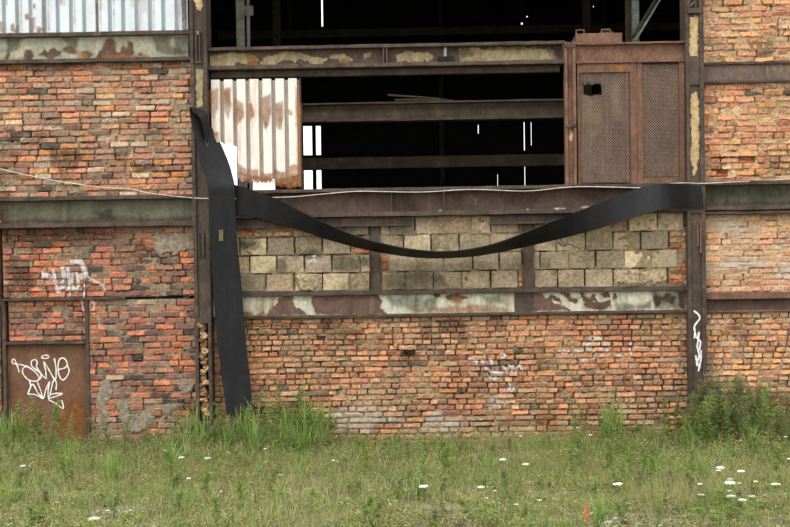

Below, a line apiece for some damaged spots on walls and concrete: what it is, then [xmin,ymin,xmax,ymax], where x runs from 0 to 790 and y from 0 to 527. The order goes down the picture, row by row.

peeling [24,38,141,59]
peeling [396,50,433,62]
peeling [457,46,556,61]
peeling [689,15,699,57]
corrosion [210,89,282,128]
peeling [690,92,700,176]
corrosion [237,145,300,188]